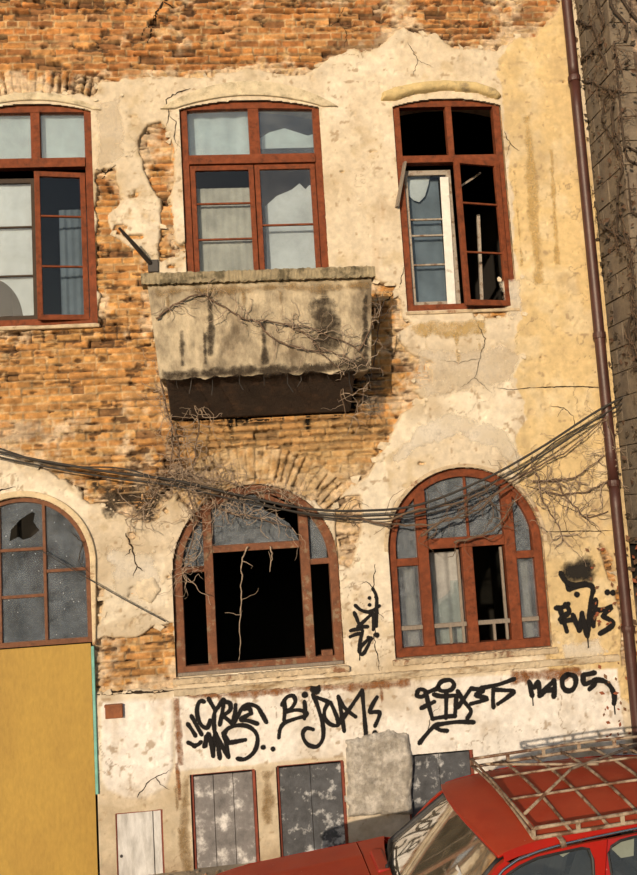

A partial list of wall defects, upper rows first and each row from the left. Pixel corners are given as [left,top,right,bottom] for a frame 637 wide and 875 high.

crack [141,0,173,43]
spalling [0,0,561,97]
spalling [138,123,180,262]
spalling [0,170,528,567]
damp [163,283,383,438]
crack [440,326,599,432]
peeling [96,544,165,624]
spalling [93,623,177,695]
crack [137,770,170,798]